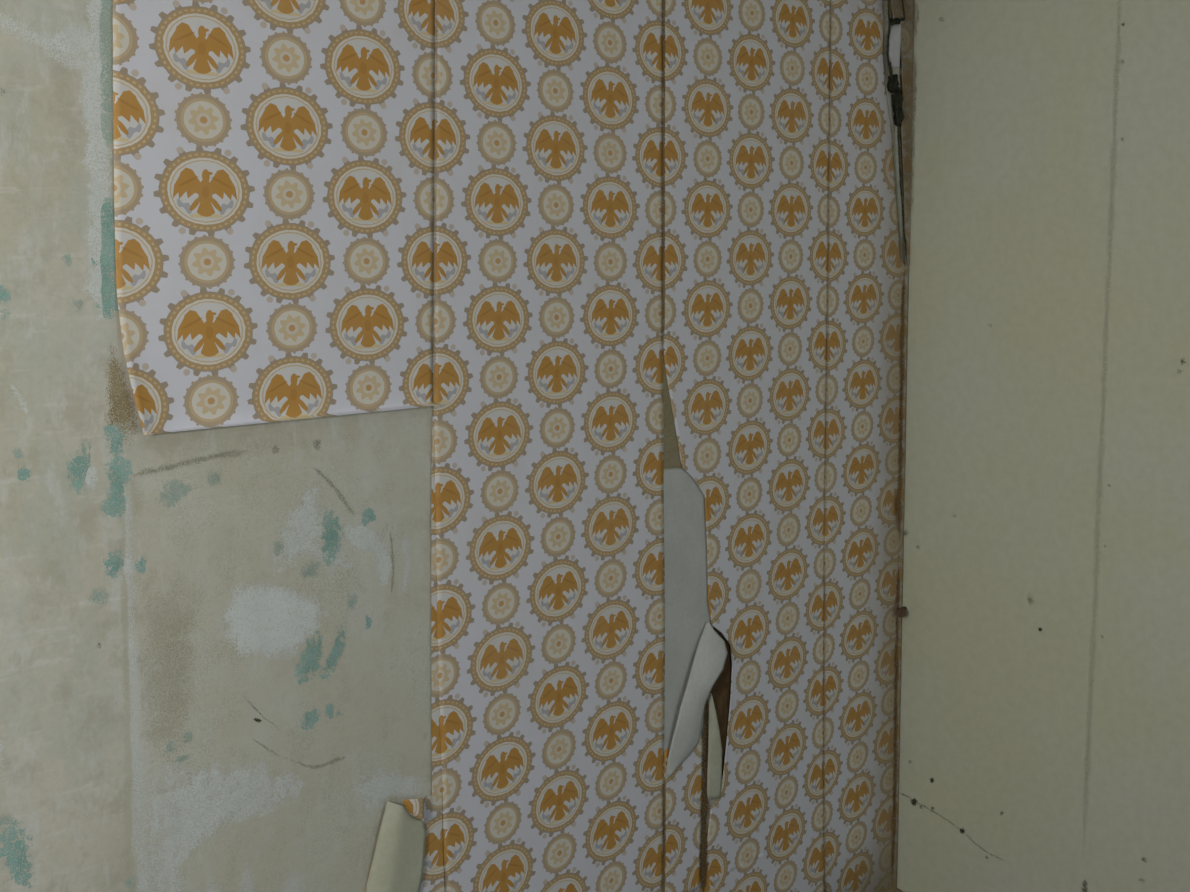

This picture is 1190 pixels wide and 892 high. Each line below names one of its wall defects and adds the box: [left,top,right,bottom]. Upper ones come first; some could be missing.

peeling [61,0,119,320]
peeling [65,423,132,518]
peeling [87,550,147,608]
peeling [0,814,35,892]